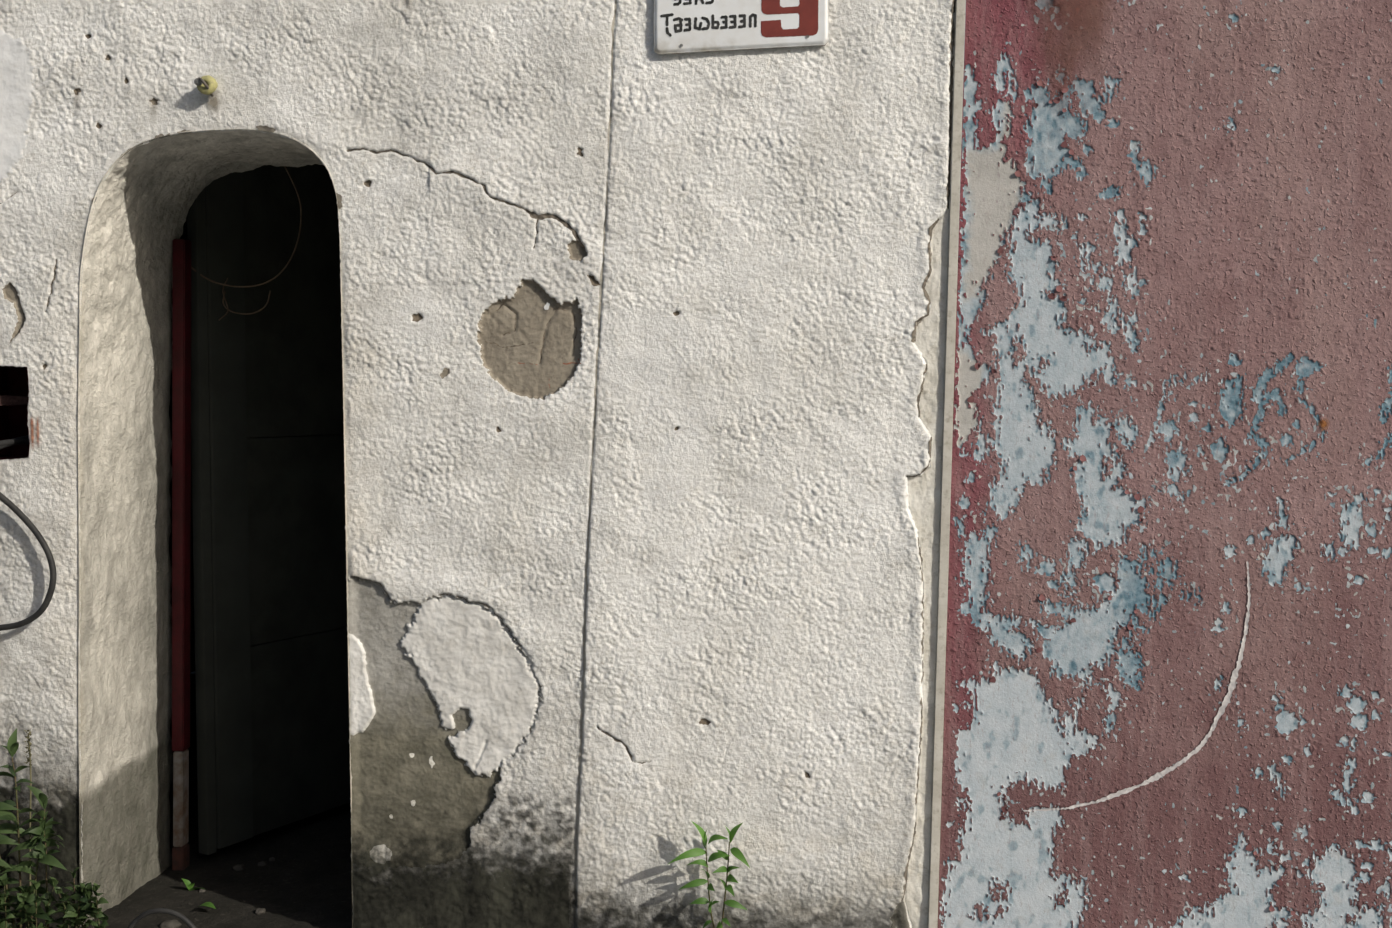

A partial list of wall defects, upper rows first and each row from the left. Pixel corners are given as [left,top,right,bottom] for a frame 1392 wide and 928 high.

crack [45,259,57,312]
spalling [477,279,582,400]
spalling [567,240,600,286]
crack [347,0,646,928]
peeling [891,0,1392,928]
spalling [347,576,542,867]
damp [352,800,901,928]